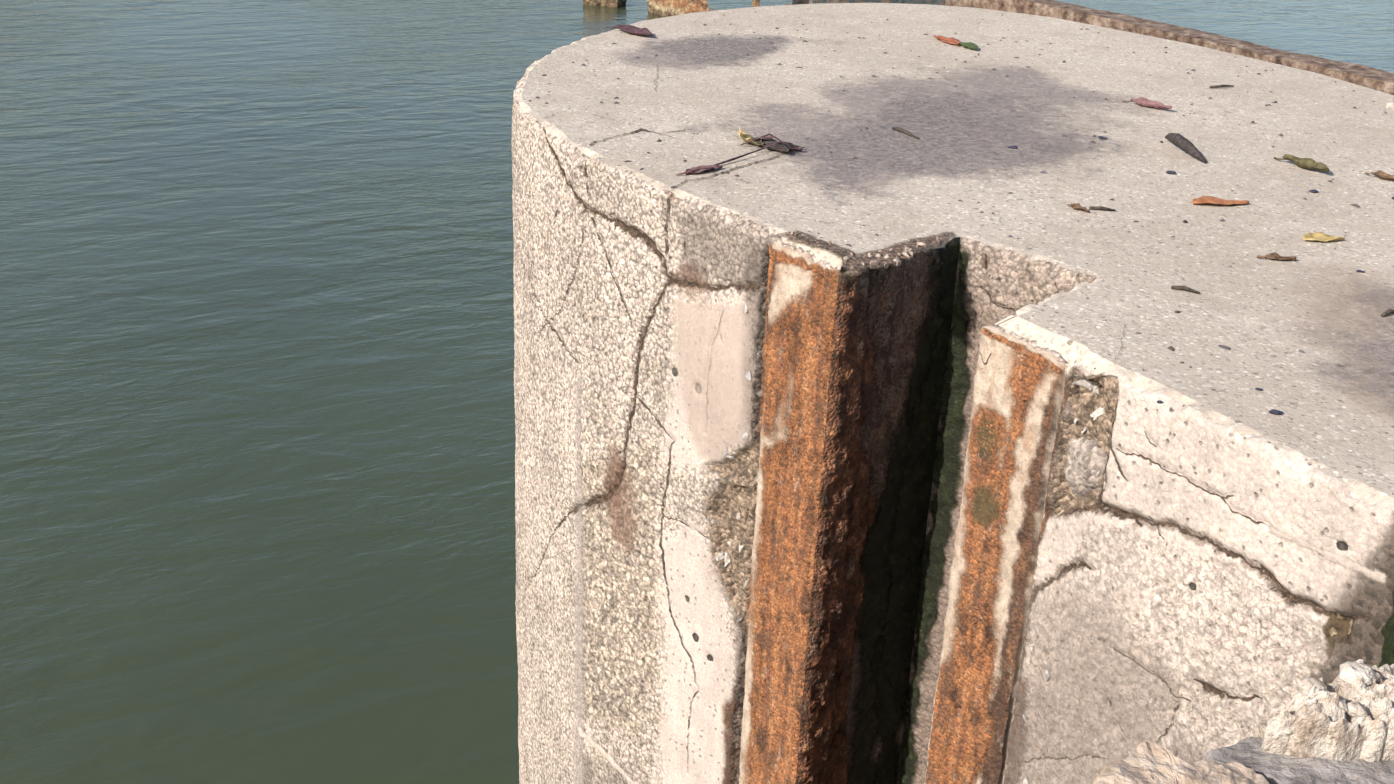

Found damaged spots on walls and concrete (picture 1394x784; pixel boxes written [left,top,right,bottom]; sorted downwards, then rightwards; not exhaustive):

crack [529,114,781,768]
peeling [705,231,954,784]
rust [722,245,941,784]
rust [925,328,1071,784]
crack [1028,561,1091,609]
spalling [1050,366,1119,516]
crack [1046,419,1371,620]
crack [1015,754,1107,764]
crack [1113,648,1263,762]